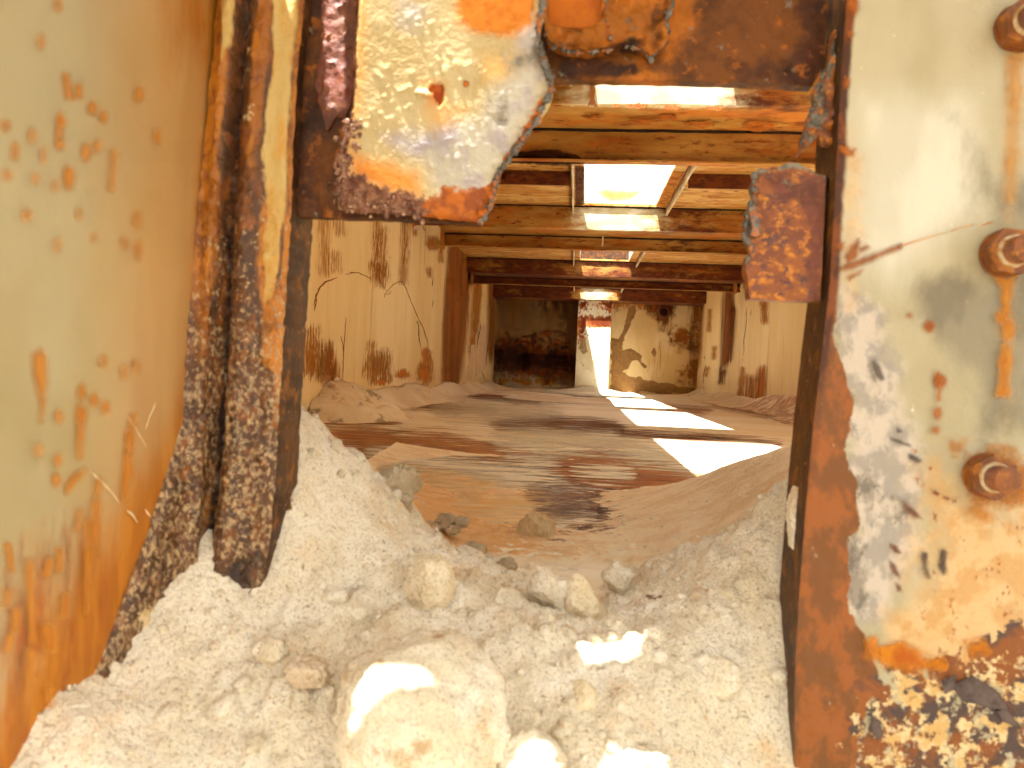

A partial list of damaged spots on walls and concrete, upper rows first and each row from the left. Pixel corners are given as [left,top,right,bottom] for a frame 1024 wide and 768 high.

corrosion [614,102,723,128]
corrosion [34,352,46,398]
corrosion [303,324,340,386]
corrosion [319,118,789,529]
peeling [610,306,695,394]
corrosion [994,275,1017,397]
spalling [892,429,921,462]
spalling [902,501,919,518]
spalling [890,544,901,591]
spalling [921,549,948,579]
corrosion [4,550,62,681]
peeling [870,717,883,740]